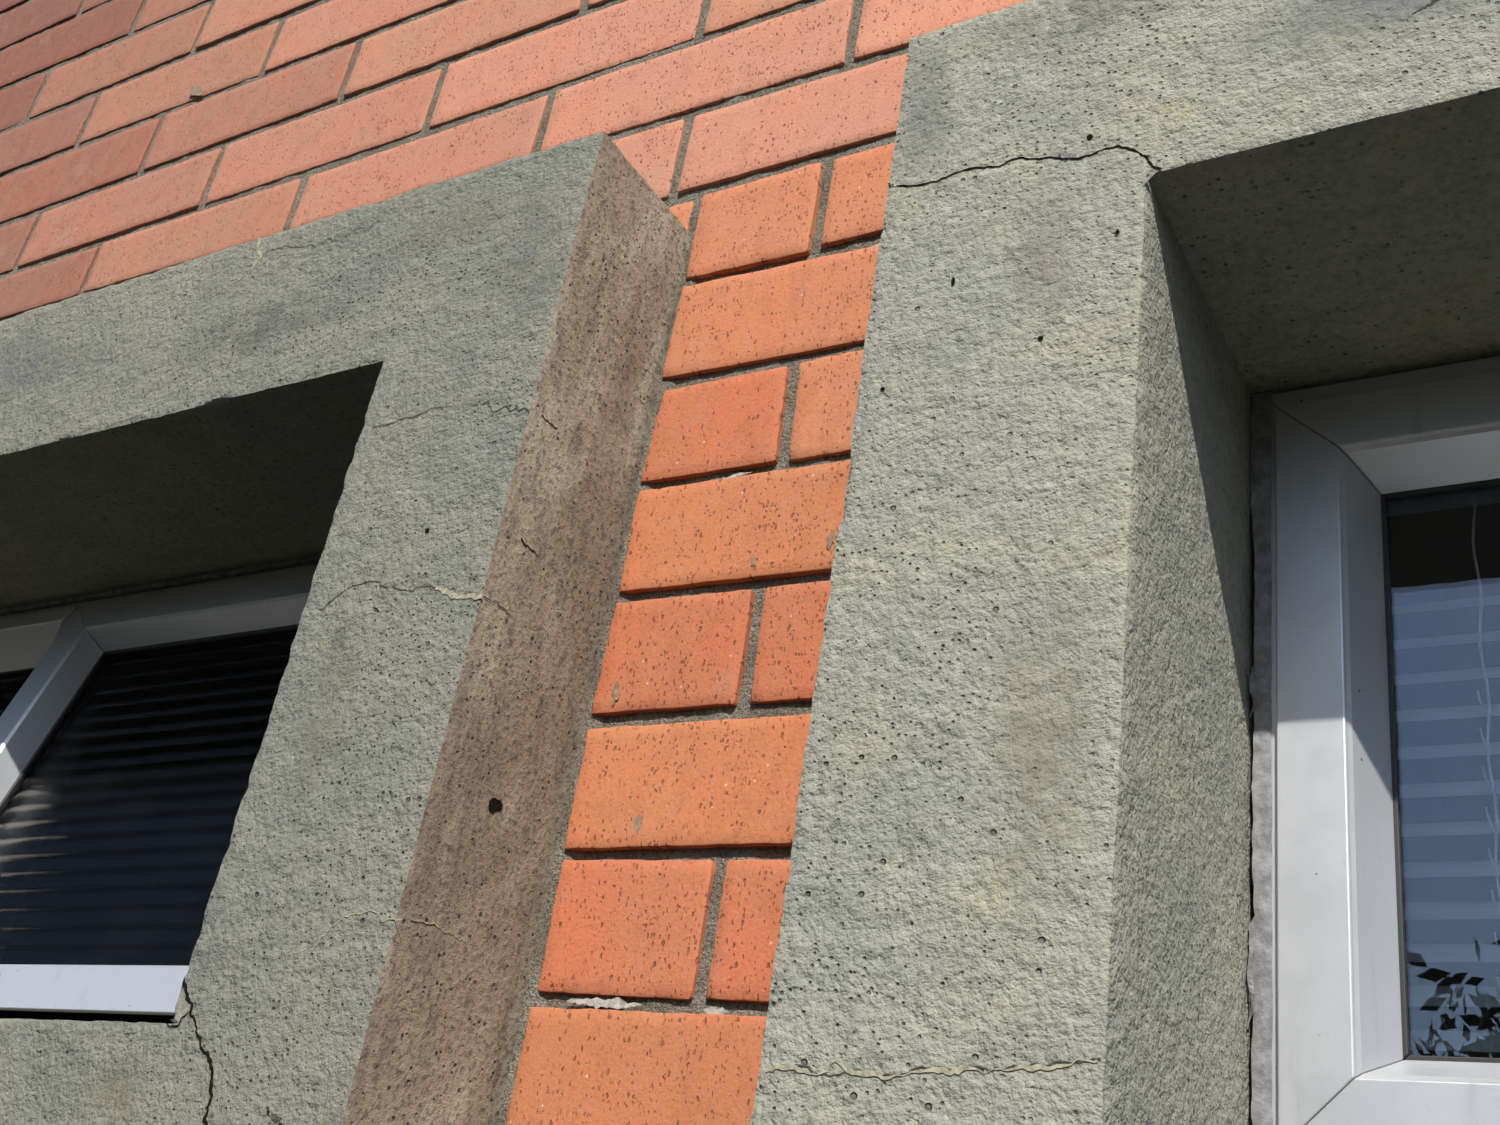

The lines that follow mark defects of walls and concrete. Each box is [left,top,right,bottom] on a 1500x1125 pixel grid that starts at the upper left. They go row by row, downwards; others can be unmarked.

crack [888,145,1162,187]
crack [319,580,513,617]
crack [166,976,214,1125]
crack [764,1058,1101,1080]